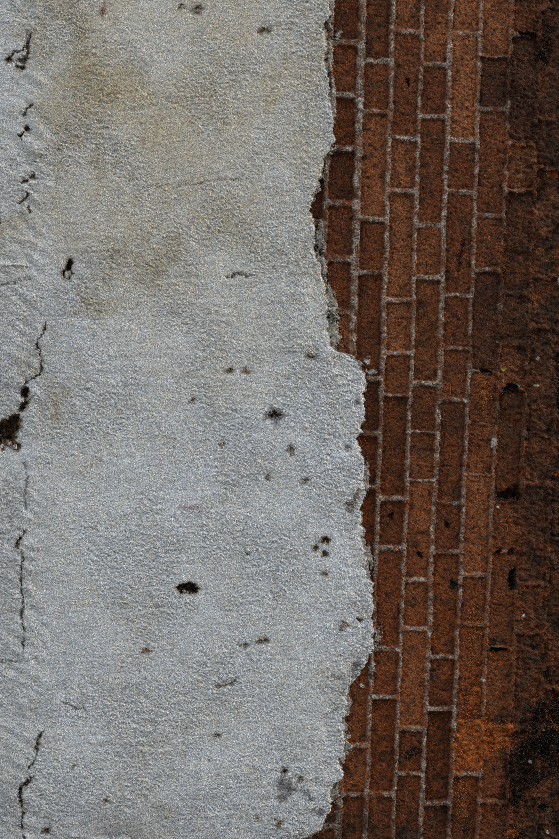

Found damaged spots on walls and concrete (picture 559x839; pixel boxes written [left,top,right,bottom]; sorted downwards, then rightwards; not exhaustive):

peeling [322,0,337,131]
peeling [309,143,368,405]
crack [22,323,46,408]
spalling [312,536,331,557]
spalling [345,432,375,662]
spalling [449,681,516,769]
crack [18,731,44,839]